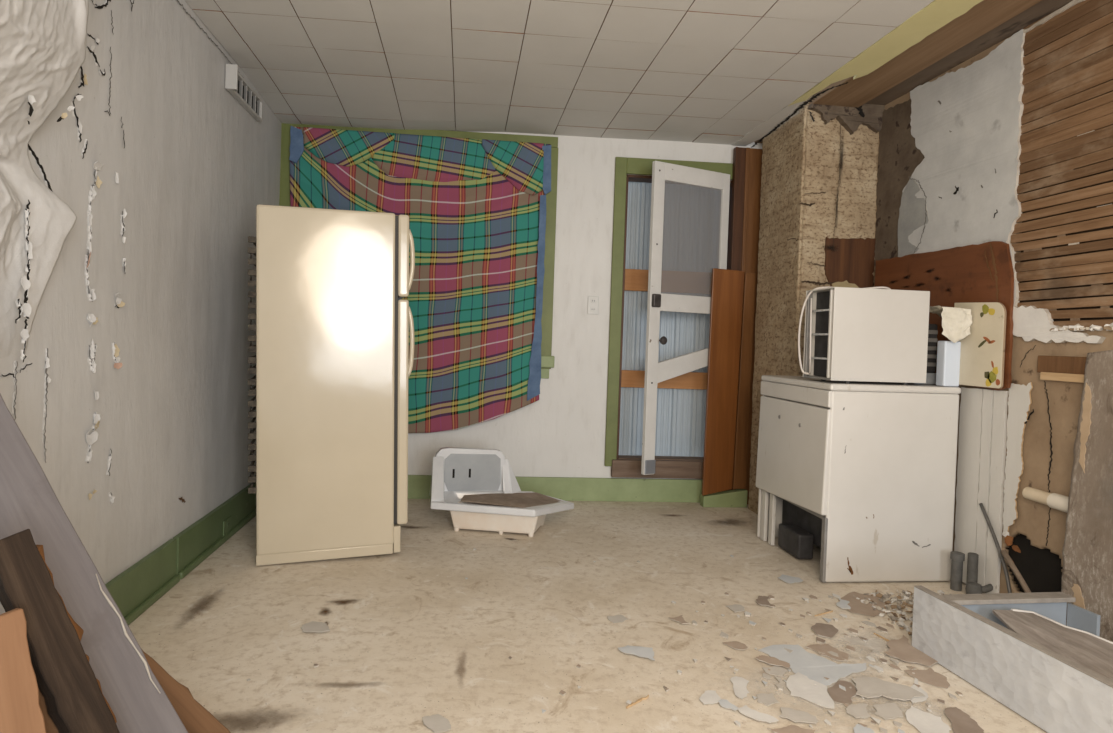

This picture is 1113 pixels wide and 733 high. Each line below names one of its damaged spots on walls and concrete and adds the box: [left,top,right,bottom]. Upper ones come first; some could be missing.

peeling [85,161,119,373]
flaking render [808,0,1113,344]
peeling [85,391,100,463]
spalling [1002,531,1063,593]